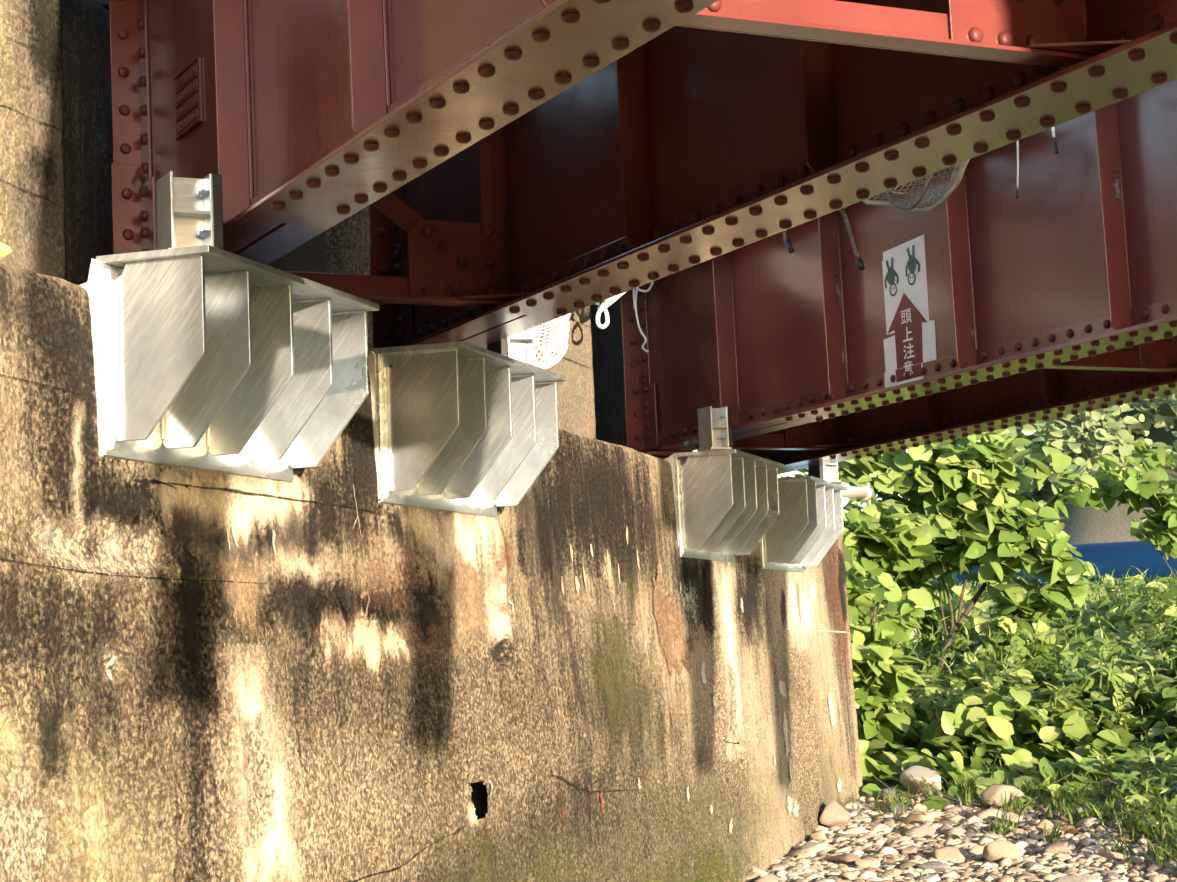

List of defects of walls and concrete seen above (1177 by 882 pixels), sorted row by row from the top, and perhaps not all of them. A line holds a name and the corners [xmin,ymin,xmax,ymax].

leakage [0,0,28,258]
crack [134,478,376,538]
leakage [534,429,653,595]
crack [0,558,268,584]
leakage [0,271,404,882]
leakage [517,527,527,575]
crack [347,826,466,882]